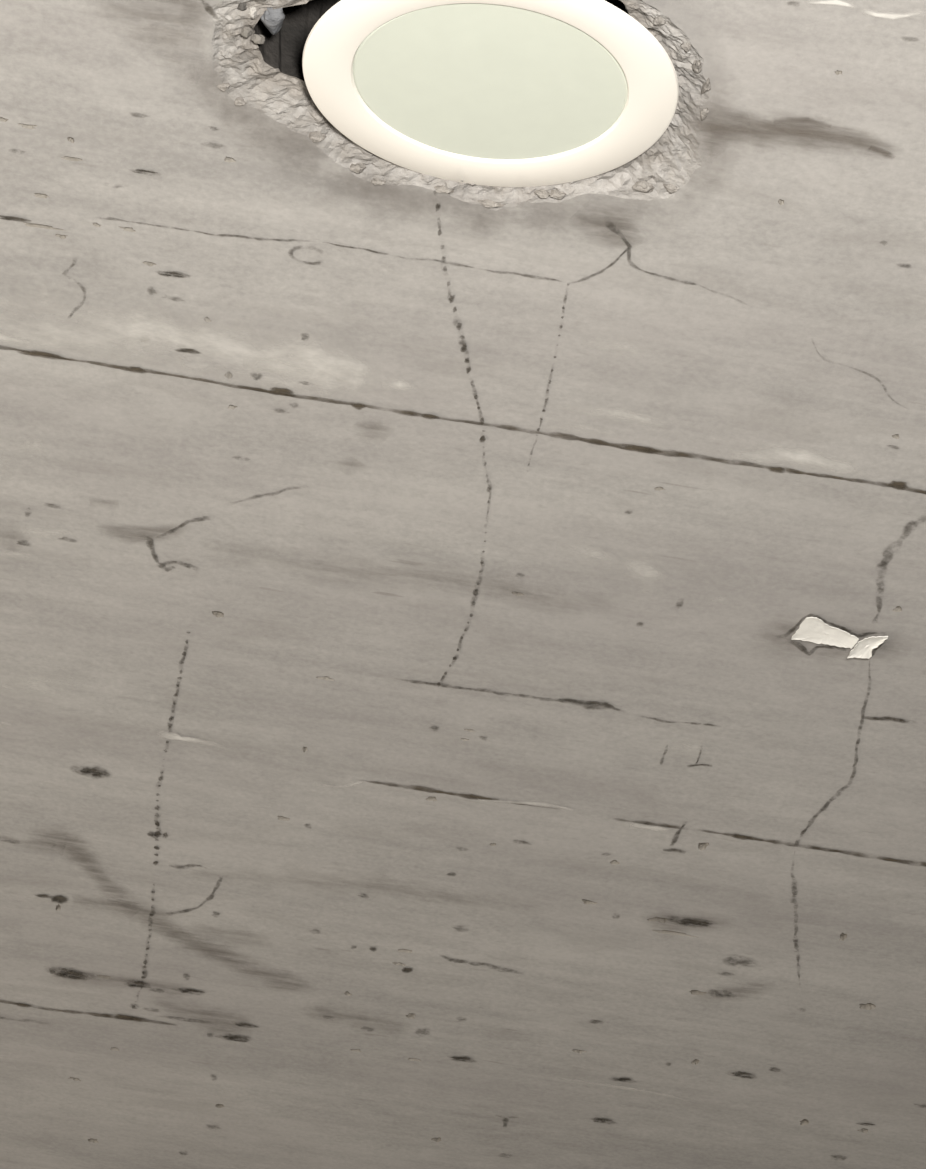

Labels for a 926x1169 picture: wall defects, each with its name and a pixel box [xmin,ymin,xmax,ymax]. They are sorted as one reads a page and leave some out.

spalling [206,0,711,210]
crack [592,241,654,276]
crack [449,296,485,442]
crack [413,562,524,696]
peeling [788,614,888,659]
crack [559,699,615,709]
crack [851,676,905,778]
crack [148,777,199,868]